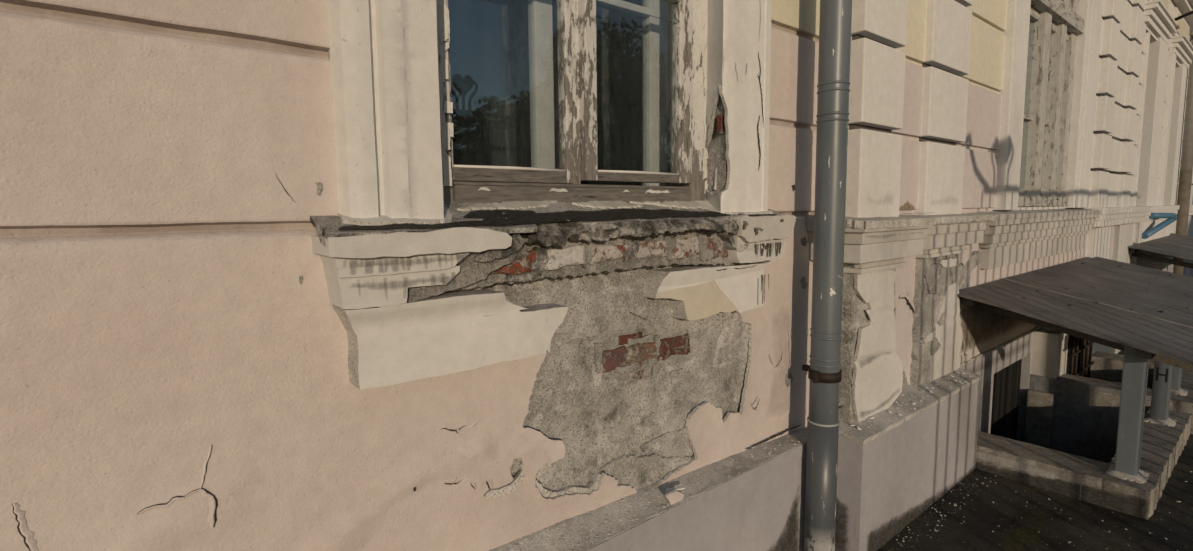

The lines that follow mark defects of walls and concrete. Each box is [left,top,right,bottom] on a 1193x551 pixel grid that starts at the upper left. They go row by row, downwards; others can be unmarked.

peeling [437,0,454,186]
flaking render [407,94,763,499]
flaking render [821,263,874,425]
flaking render [902,251,978,387]
crack [12,502,39,551]
crack [137,445,218,528]